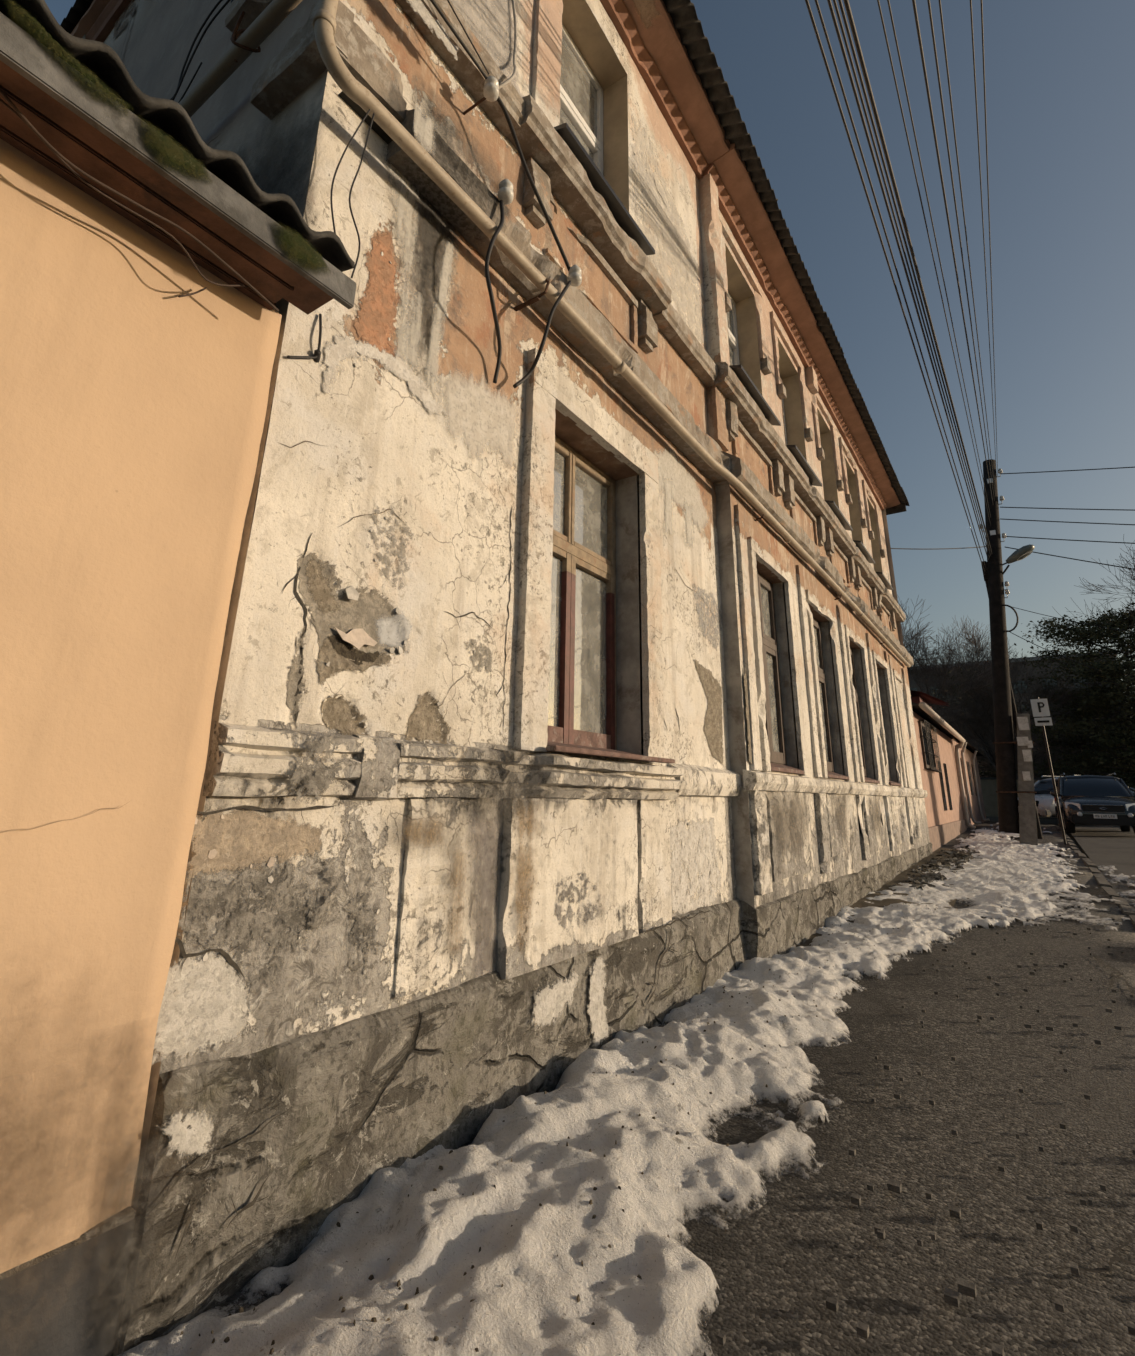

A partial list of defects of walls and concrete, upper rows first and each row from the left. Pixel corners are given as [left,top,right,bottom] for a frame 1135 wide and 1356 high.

peeling [408,0,458,60]
water stain [250,121,314,221]
crack [282,508,409,729]
flaking render [286,507,414,736]
crack [444,505,512,730]
flaking render [693,660,724,764]
crack [0,803,127,833]
water stain [774,798,807,845]
water stain [836,802,846,833]
flaking render [152,808,322,1064]
water stain [456,815,500,971]
crack [644,910,710,1004]